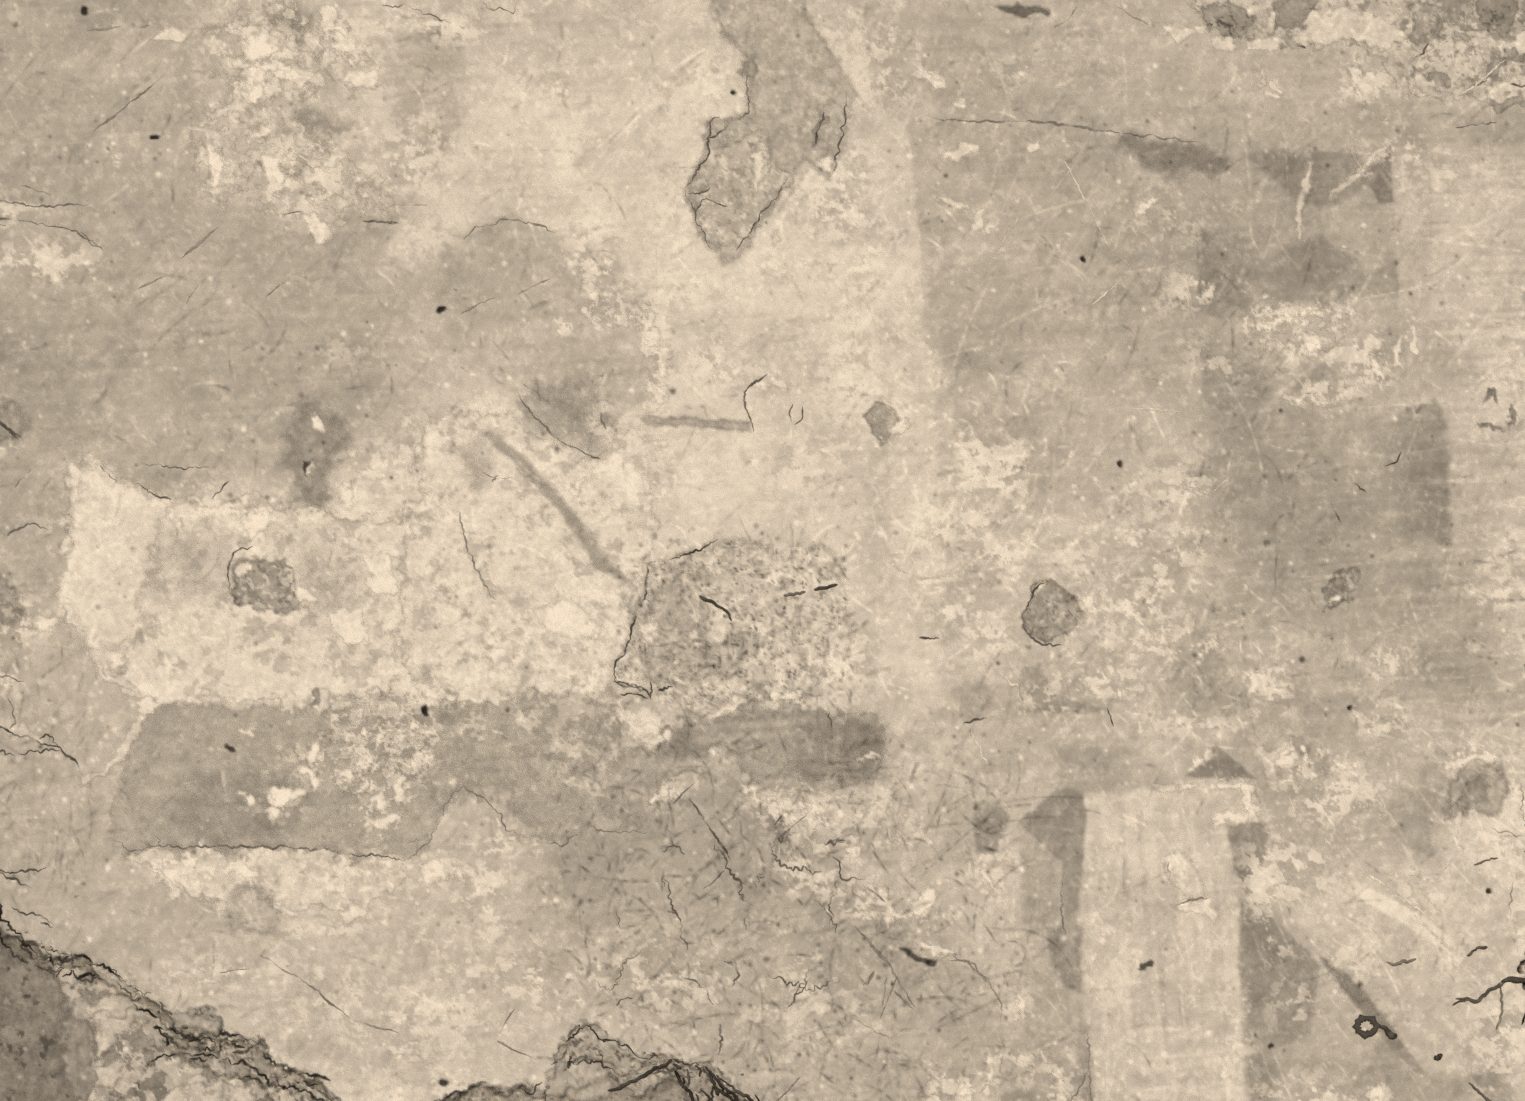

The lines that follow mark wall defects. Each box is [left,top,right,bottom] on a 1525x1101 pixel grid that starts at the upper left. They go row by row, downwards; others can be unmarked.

spalling [686,0,857,263]
spalling [0,927,341,1101]
spalling [439,1020,760,1101]